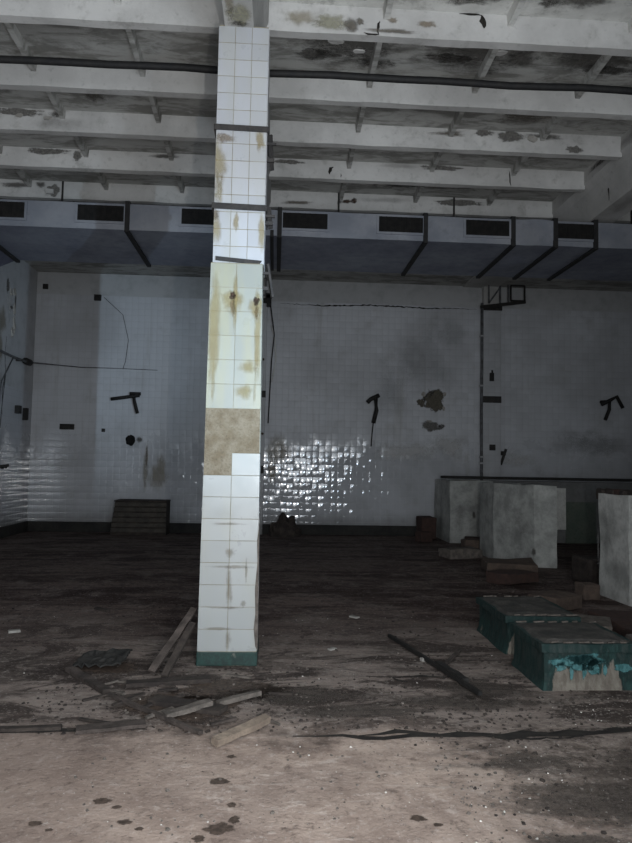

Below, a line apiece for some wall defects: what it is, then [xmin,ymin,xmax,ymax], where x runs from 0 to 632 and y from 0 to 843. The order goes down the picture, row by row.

leakage [319,17,345,29]
leakage [298,39,394,67]
leakage [425,47,538,72]
leakage [562,53,632,76]
spalling [417,389,446,432]
peeling [204,408,260,475]